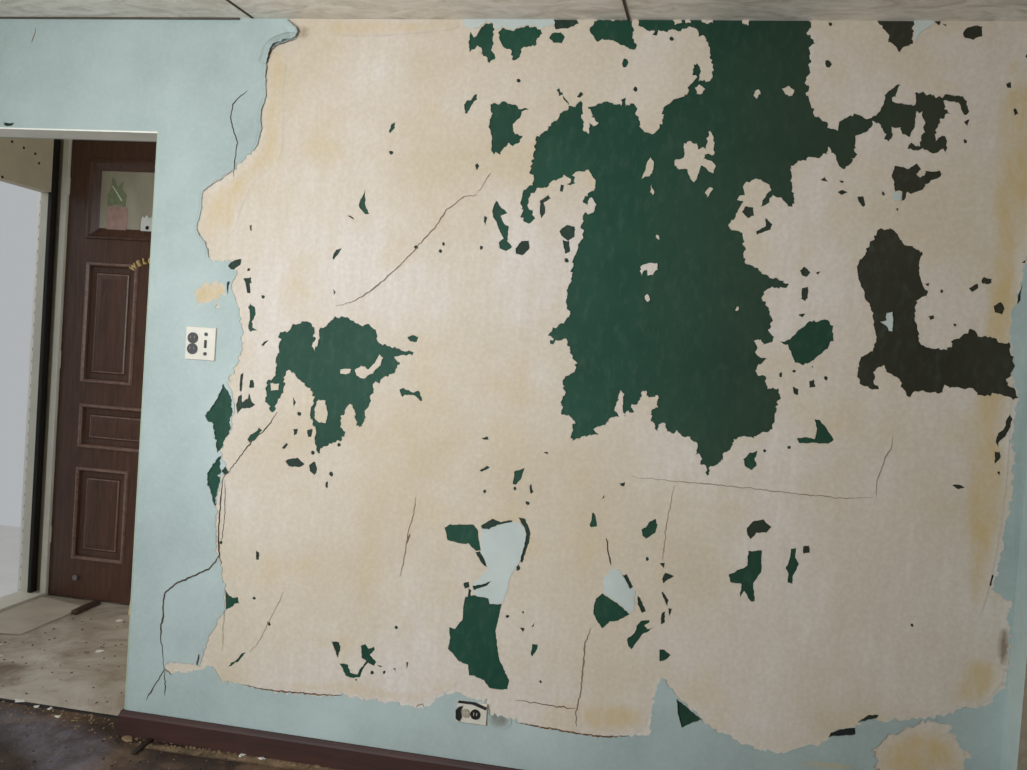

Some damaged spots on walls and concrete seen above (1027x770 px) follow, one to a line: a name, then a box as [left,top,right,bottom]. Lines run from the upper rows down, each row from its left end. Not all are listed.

peeling [489,102,528,154]
crack [337,173,491,306]
peeling [520,20,969,475]
peeling [857,228,1019,400]
leakage [980,56,1027,356]
peeling [206,385,233,451]
peeling [265,316,414,453]
crack [146,414,276,700]
peeling [473,518,531,604]
leakage [963,376,1013,618]
peeling [448,595,509,690]
leakage [877,728,965,770]